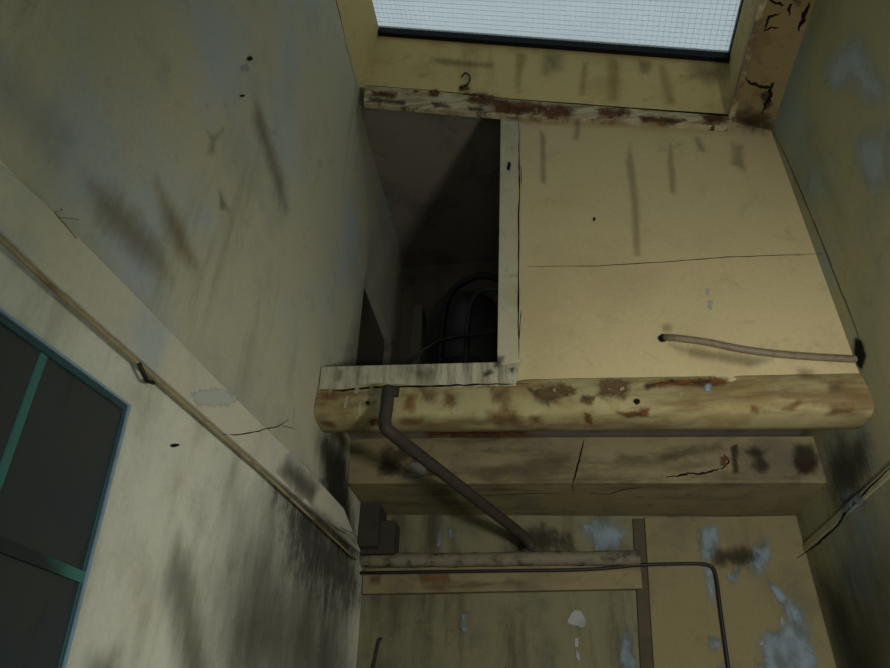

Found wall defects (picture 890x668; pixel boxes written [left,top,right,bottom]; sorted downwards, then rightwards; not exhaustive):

crack [764,0,810,31]
corrosion [466,92,574,120]
corrosion [599,107,685,126]
crack [745,77,774,114]
crack [598,133,859,339]
corrosion [426,414,528,438]
crack [665,455,730,478]
crack [797,468,890,558]
water stain [287,492,356,607]
peeling [699,527,718,598]
water stain [237,556,337,668]
peeling [756,582,817,668]